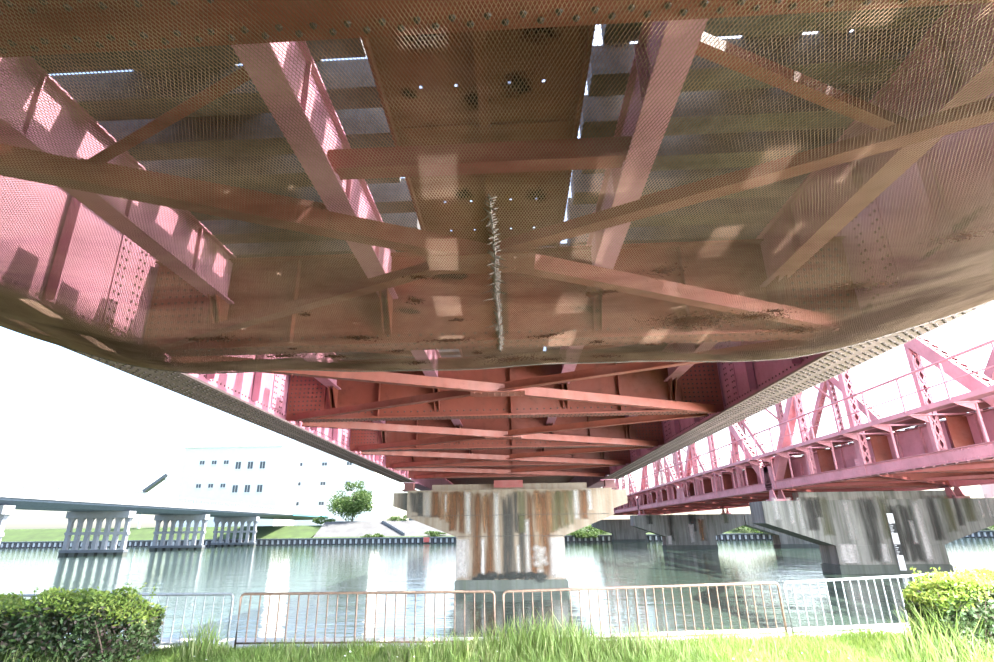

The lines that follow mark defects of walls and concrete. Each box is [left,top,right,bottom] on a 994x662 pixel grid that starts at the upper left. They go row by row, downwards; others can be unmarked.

corrosion [431,492,493,575]
leakage [495,492,529,574]
corrosion [528,491,568,575]
leakage [553,491,591,577]
corrosion [580,490,588,519]
leakage [841,503,857,563]
leakage [860,495,992,562]